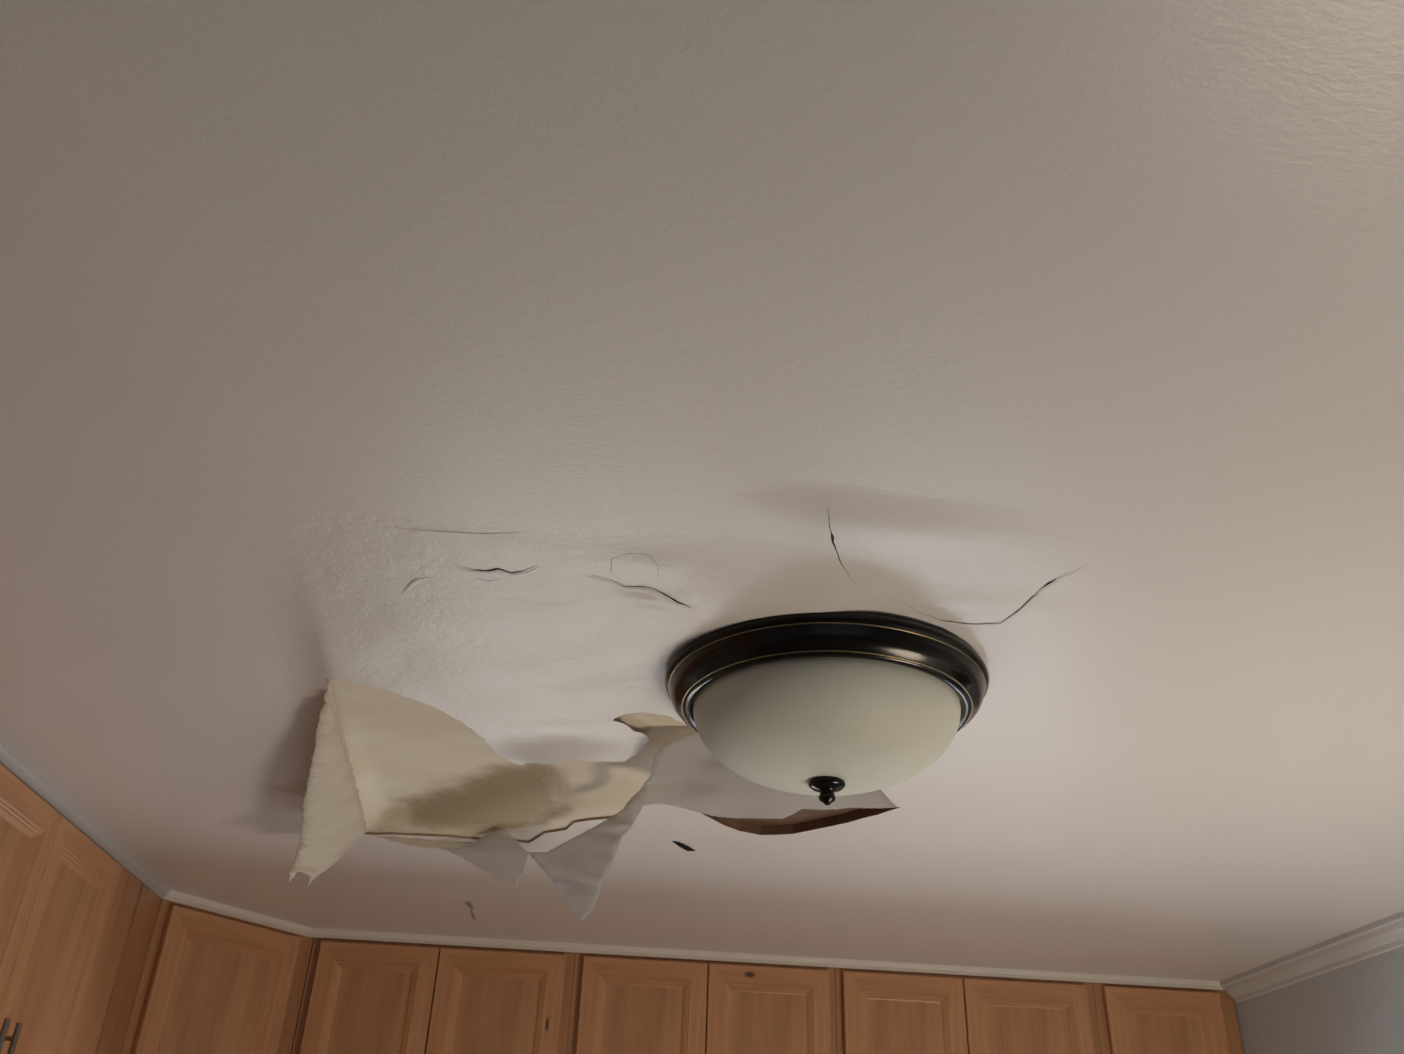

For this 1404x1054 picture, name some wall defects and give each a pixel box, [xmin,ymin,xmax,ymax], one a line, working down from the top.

crack [387,527,541,596]
crack [586,553,688,610]
crack [827,509,850,577]
crack [898,567,1084,627]
peeling [288,678,897,920]